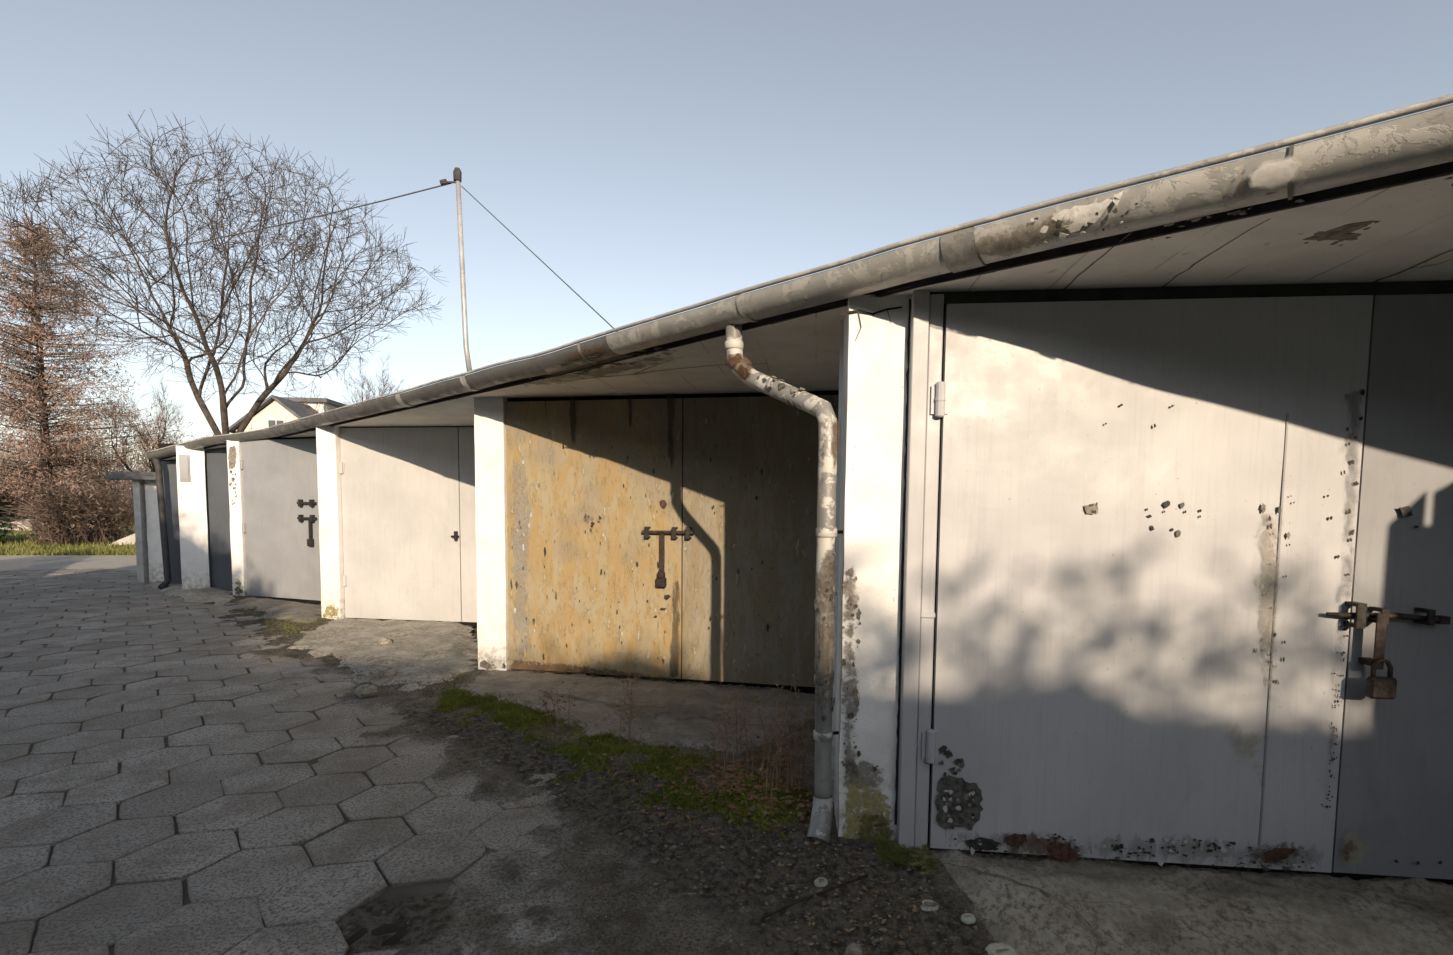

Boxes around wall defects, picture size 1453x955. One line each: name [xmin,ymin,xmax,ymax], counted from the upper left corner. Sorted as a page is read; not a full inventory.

peeling [1031,191,1138,244]
crack [1064,232,1132,289]
crack [1162,219,1270,287]
peeling [1303,221,1380,246]
crack [1374,249,1453,282]
peeling [757,376,806,408]
peeling [813,552,861,775]
damp [841,761,883,789]
peeling [935,745,1026,858]
rust [1002,833,1081,862]
peeling [1037,833,1318,874]
rust [1240,843,1311,868]